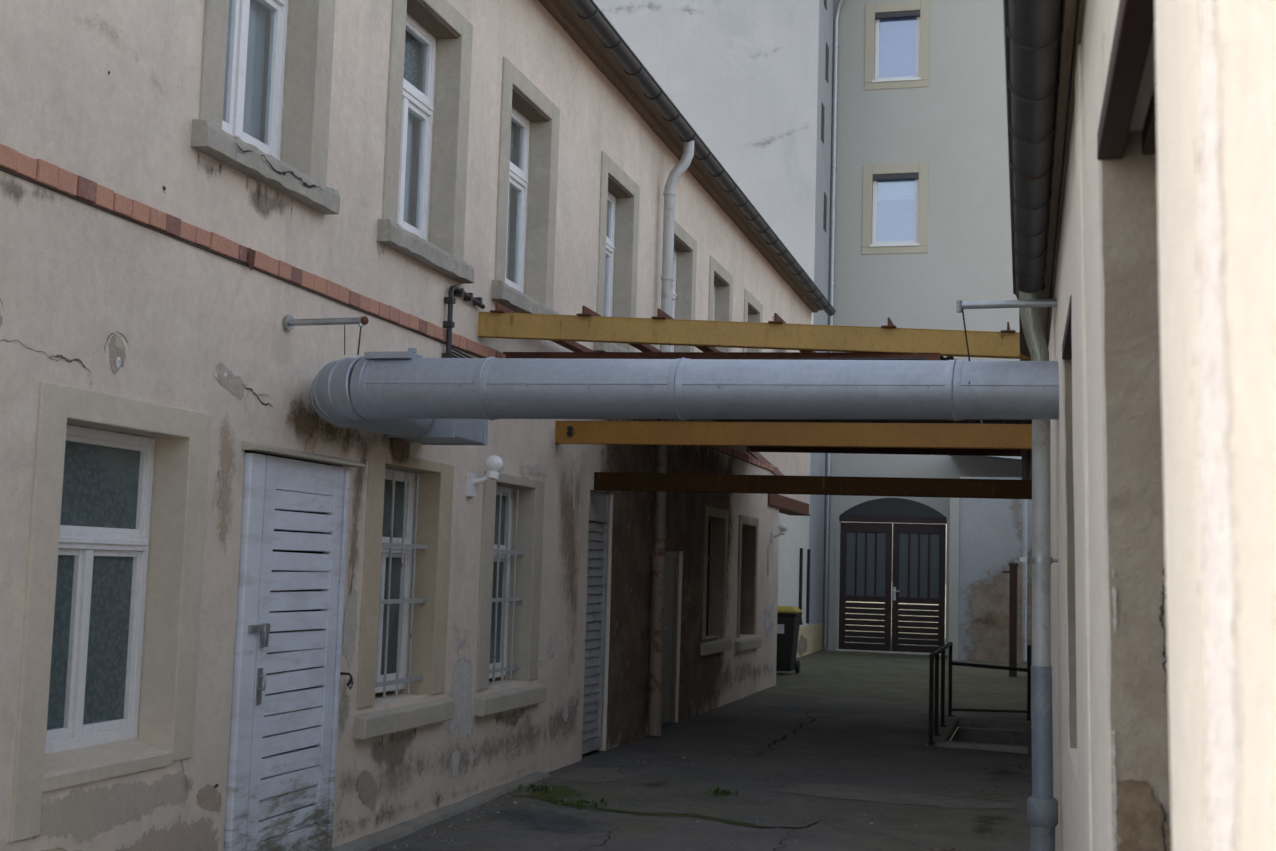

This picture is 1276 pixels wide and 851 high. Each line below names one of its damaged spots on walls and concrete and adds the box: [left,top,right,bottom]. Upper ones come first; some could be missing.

crack [235,143,322,190]
crack [1,339,91,373]
crack [242,384,272,408]
crack [1159,549,1168,693]
spalling [196,784,222,811]
crack [535,796,921,851]